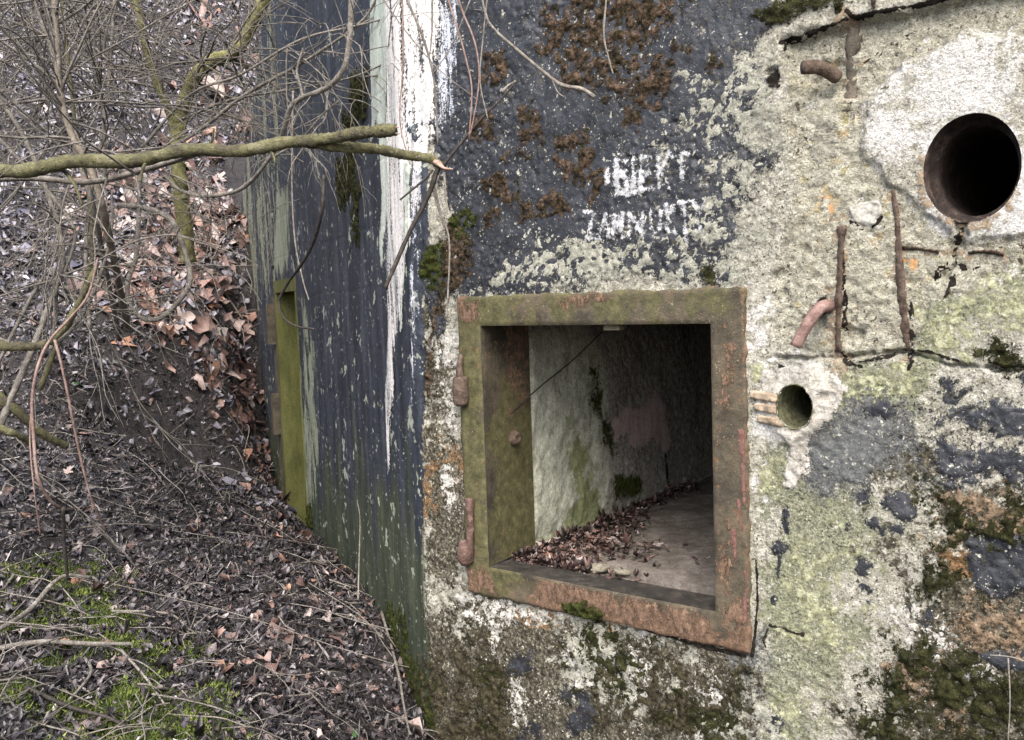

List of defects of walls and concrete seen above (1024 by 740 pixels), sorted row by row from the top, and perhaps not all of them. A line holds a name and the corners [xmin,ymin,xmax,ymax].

crack [778,0,951,53]
crack [933,225,980,298]
peeling [241,0,1024,740]
rust [467,563,502,597]
rust [532,516,746,646]